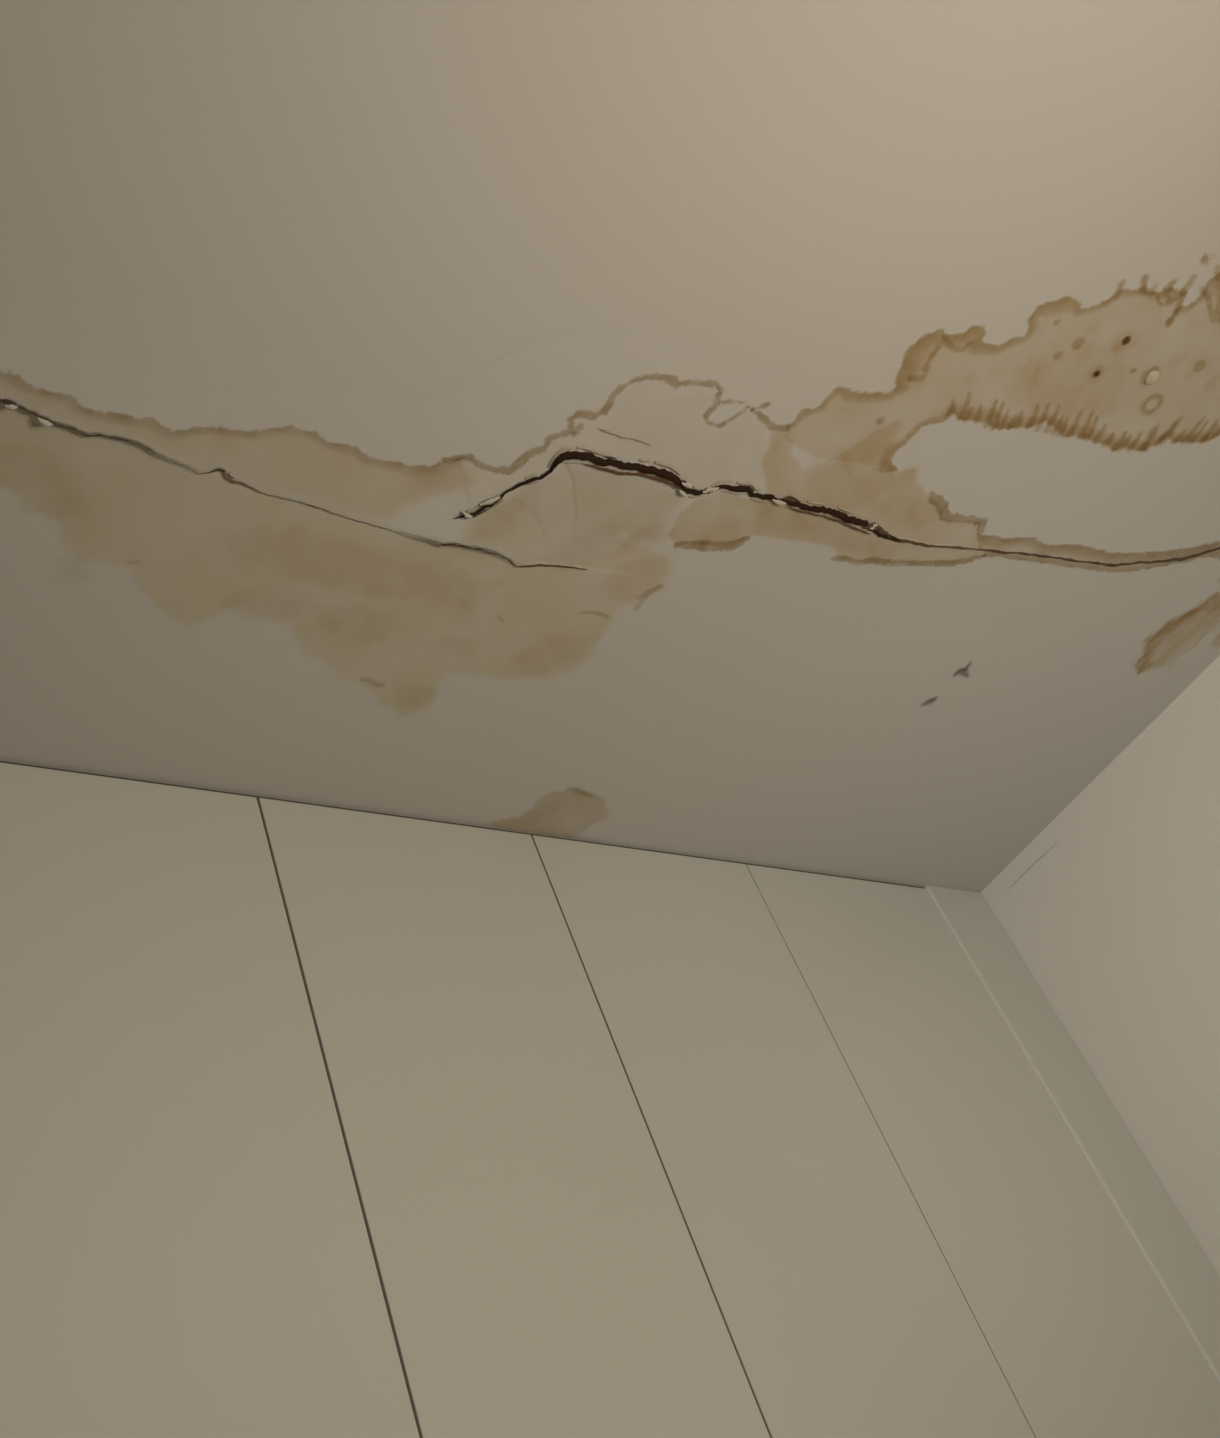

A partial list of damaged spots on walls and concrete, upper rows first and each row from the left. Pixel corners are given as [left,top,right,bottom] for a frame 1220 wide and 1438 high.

crack [0,399,1220,570]